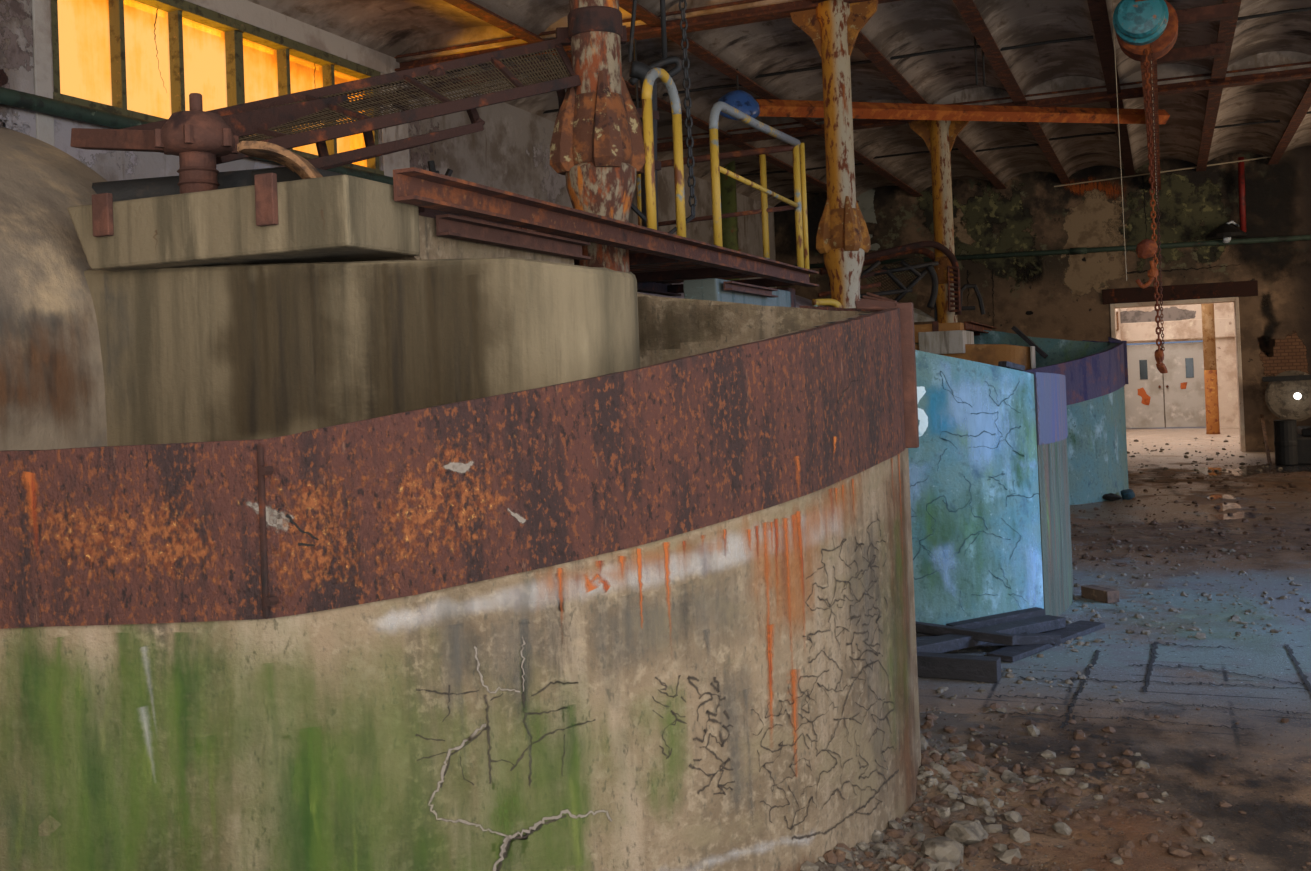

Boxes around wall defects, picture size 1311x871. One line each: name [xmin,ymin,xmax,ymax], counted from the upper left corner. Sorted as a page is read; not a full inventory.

peeling [0,0,34,89]
peeling [0,106,36,138]
peeling [54,116,138,175]
rust [8,471,222,591]
rust [267,439,517,593]
rust [586,561,610,593]
rust [619,549,643,626]
rust [663,541,685,617]
rust [747,479,854,720]
crack [652,371,1038,840]
crack [989,641,1311,730]
crack [416,637,613,871]